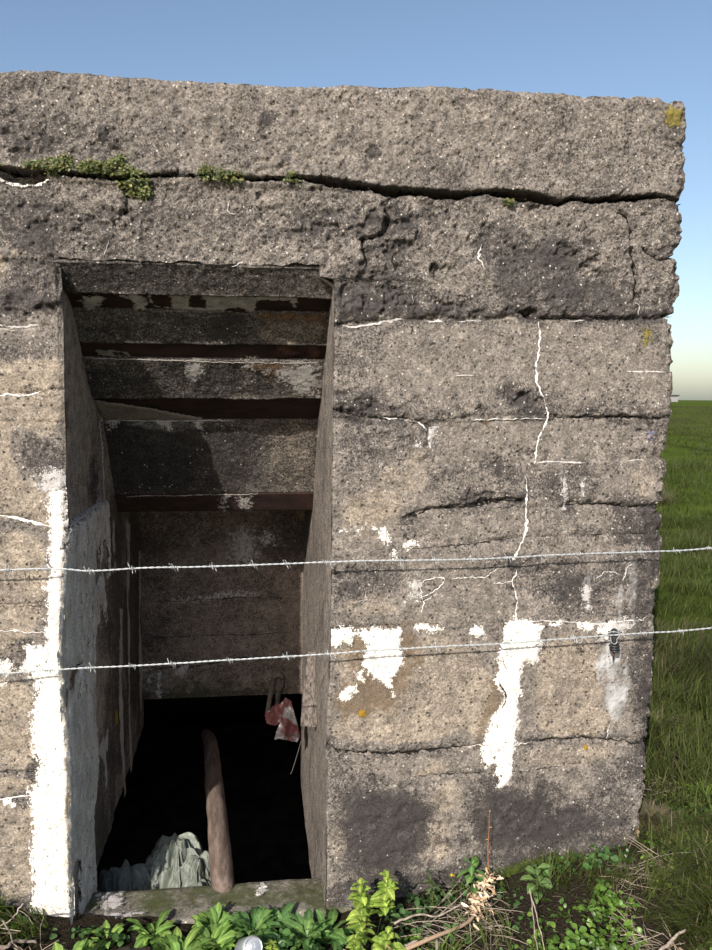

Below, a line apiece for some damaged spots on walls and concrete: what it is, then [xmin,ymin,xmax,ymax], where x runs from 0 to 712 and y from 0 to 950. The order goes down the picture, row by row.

crack [0,323,40,331]
crack [0,390,40,398]
crack [50,171,680,625]
crack [0,515,51,527]
water stain [328,615,609,895]